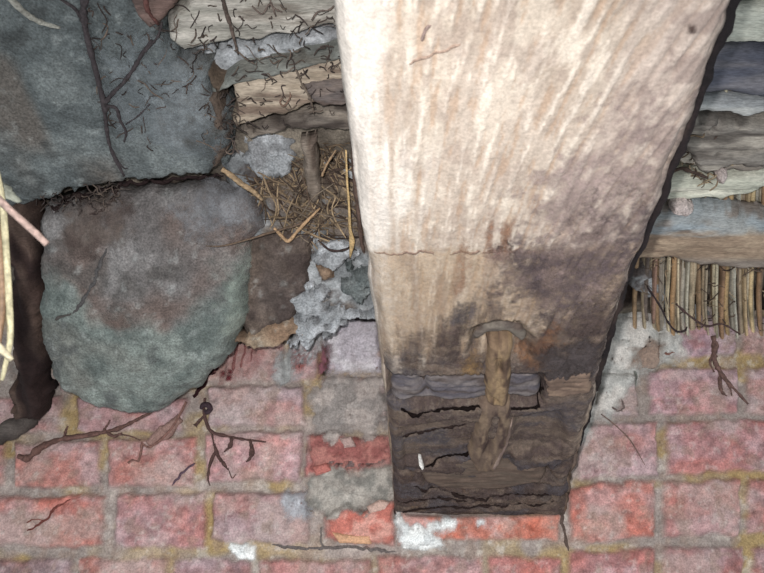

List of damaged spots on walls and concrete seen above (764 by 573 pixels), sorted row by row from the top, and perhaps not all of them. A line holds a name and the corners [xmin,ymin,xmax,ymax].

damp [374,155,659,550]
crack [401,405,481,438]
spalling [309,433,390,476]
spalling [328,500,394,544]
crack [393,452,569,551]